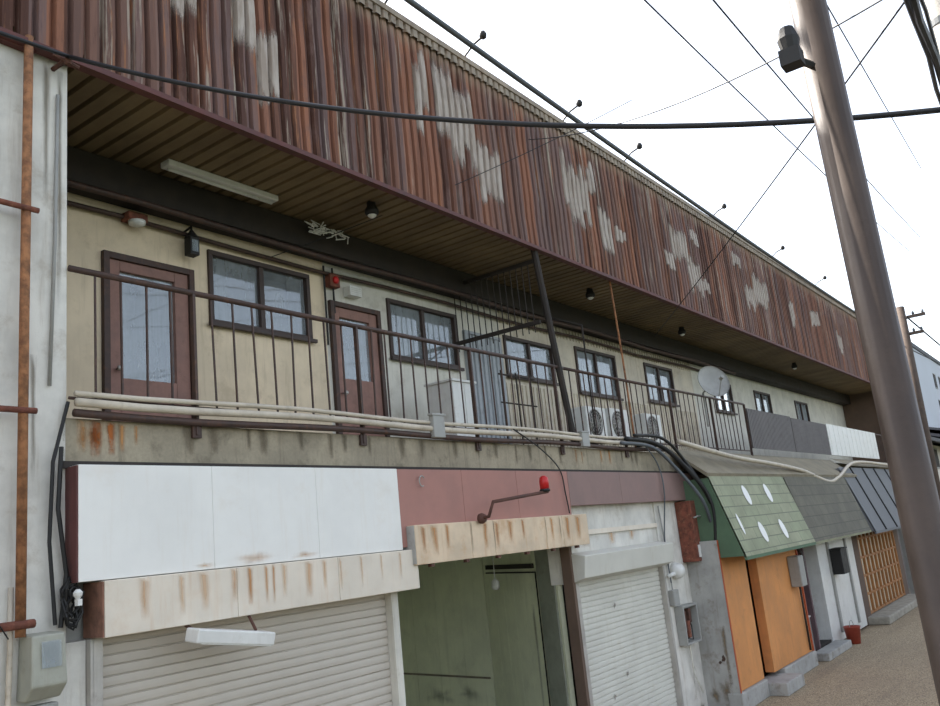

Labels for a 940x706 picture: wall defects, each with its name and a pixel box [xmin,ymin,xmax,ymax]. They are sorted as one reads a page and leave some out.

rust [80,420,123,452]